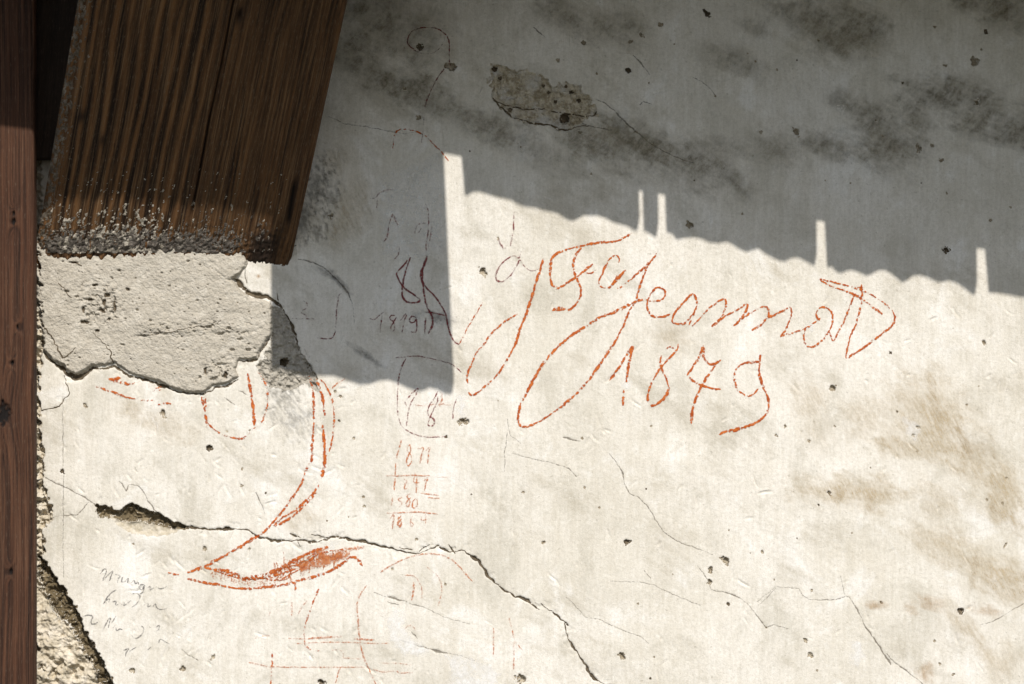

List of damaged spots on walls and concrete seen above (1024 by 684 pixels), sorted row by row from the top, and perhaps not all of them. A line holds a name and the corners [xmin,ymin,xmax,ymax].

spalling [486,63,599,134]
spalling [81,284,116,331]
spalling [256,305,320,392]
crack [37,469,604,684]
crack [796,588,923,684]